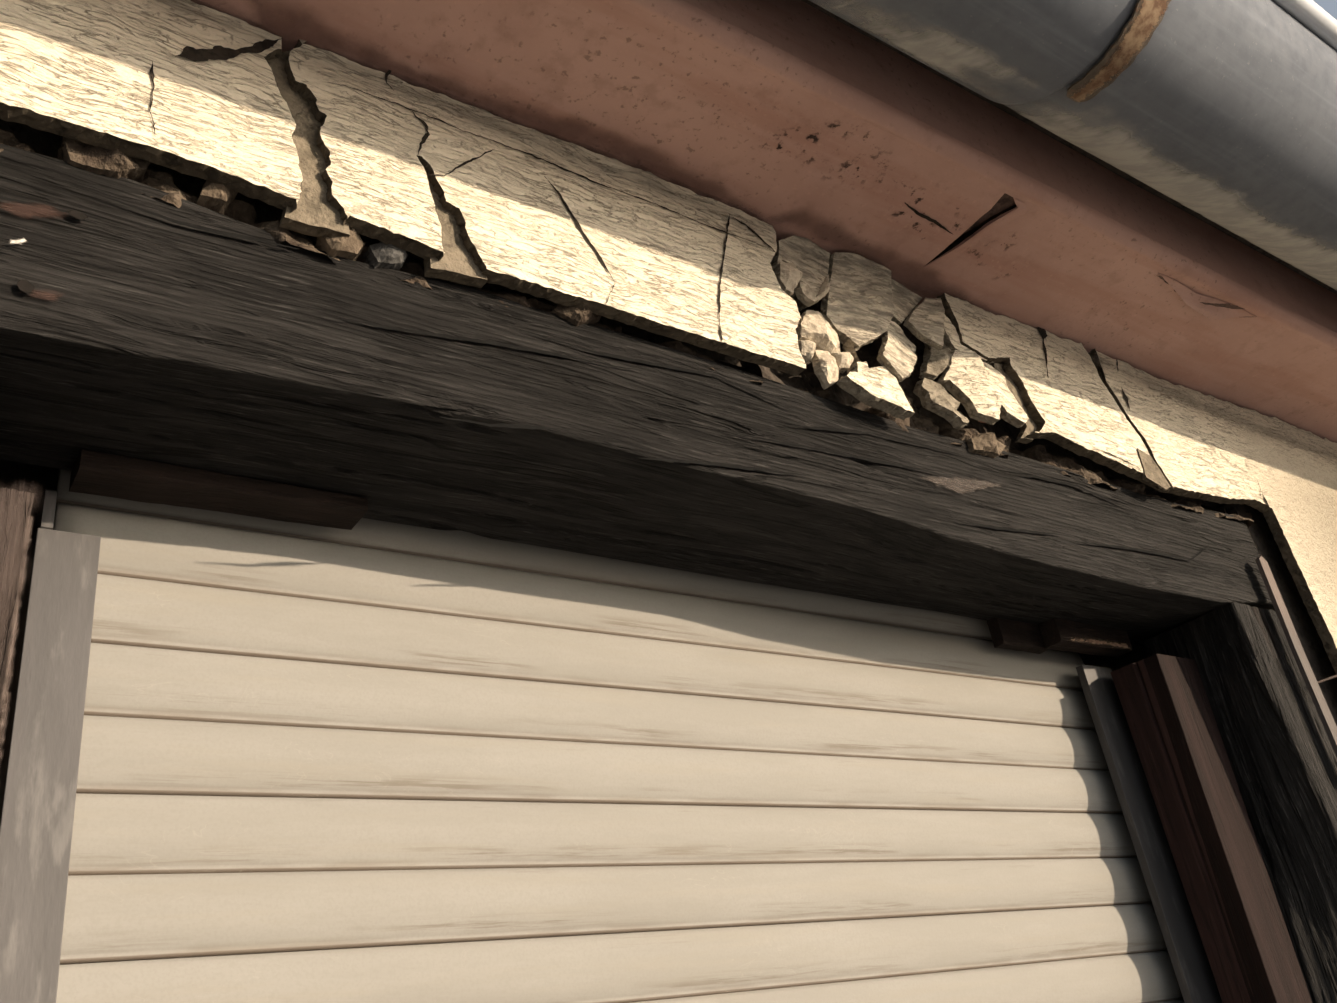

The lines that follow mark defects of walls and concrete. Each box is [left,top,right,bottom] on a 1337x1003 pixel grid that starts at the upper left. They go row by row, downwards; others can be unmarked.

crack [149,38,283,134]
rust [1070,0,1170,102]
flaking render [267,51,350,238]
crack [329,70,776,343]
flaking render [746,235,1037,458]
crack [1037,327,1048,376]
crack [1116,359,1130,410]
crack [1101,448,1170,491]